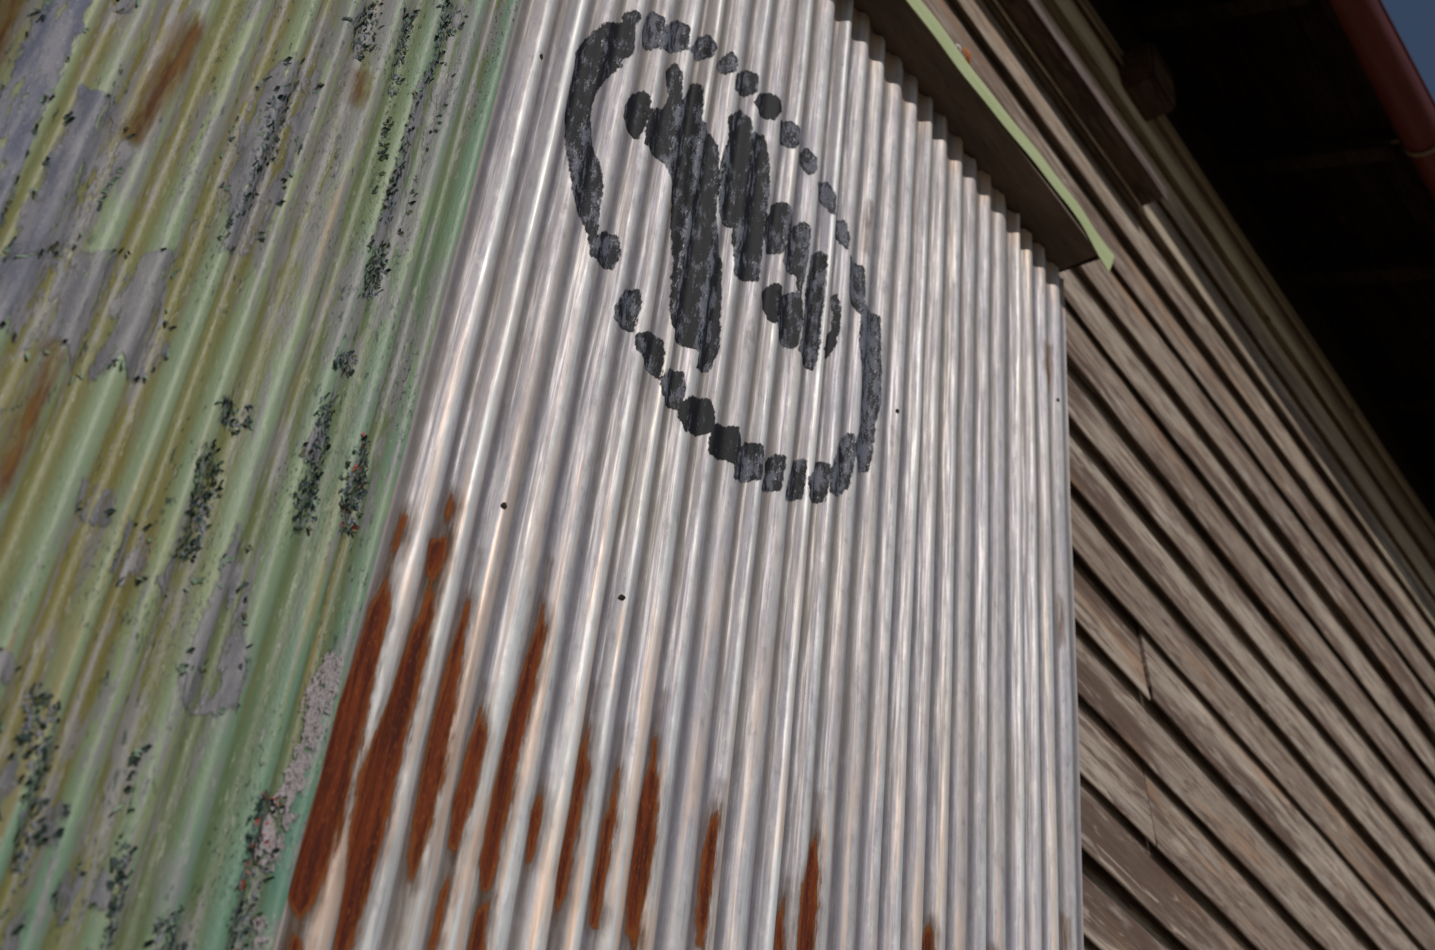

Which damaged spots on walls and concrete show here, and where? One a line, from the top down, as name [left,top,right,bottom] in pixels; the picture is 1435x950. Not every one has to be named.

peeling [0,0,179,383]
peeling [218,56,325,255]
peeling [358,0,469,301]
peeling [76,395,256,716]
peeling [290,392,372,538]
peeling [0,647,71,950]
rust [288,494,456,950]
rust [406,600,548,950]
rust [555,730,591,911]
rust [590,768,620,930]
rust [625,737,660,950]
rust [775,837,820,950]